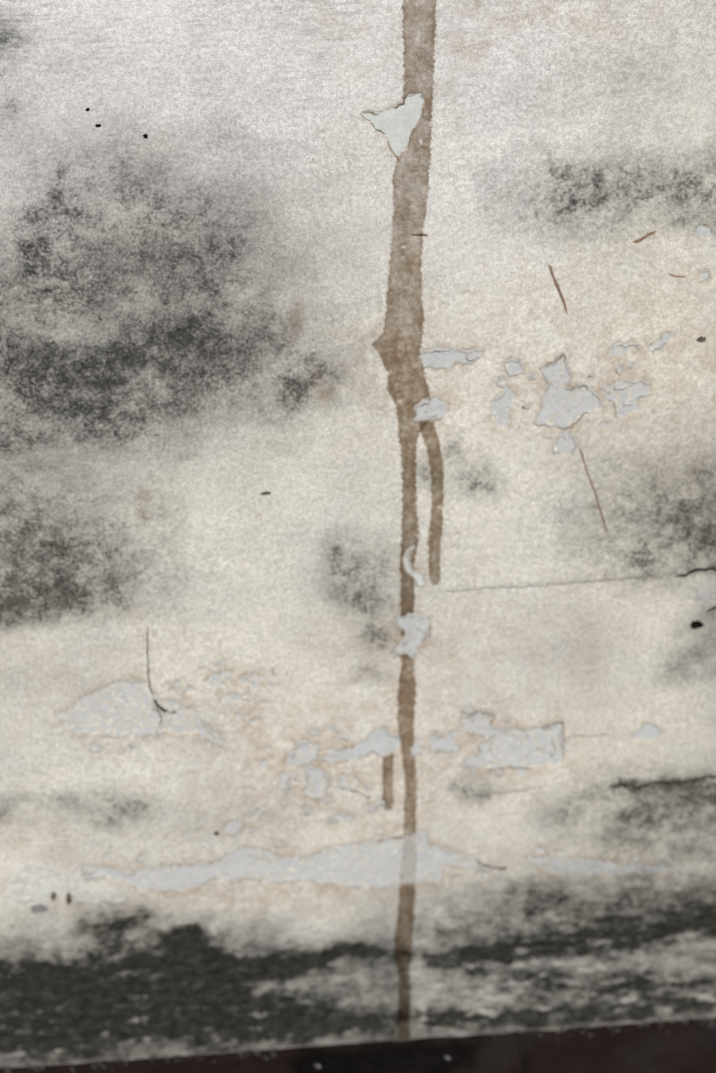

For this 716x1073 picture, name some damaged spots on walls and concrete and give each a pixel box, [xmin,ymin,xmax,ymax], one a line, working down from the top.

peeling [361,91,426,160]
mould [550,167,715,220]
mould [0,169,284,442]
mould [278,353,333,409]
peeling [410,397,447,423]
peeling [420,347,486,370]
peeling [490,333,674,456]
mould [0,484,133,628]
crack [430,566,716,593]
peeling [214,697,567,838]
spalling [31,892,73,913]
leakage [0,876,716,1073]